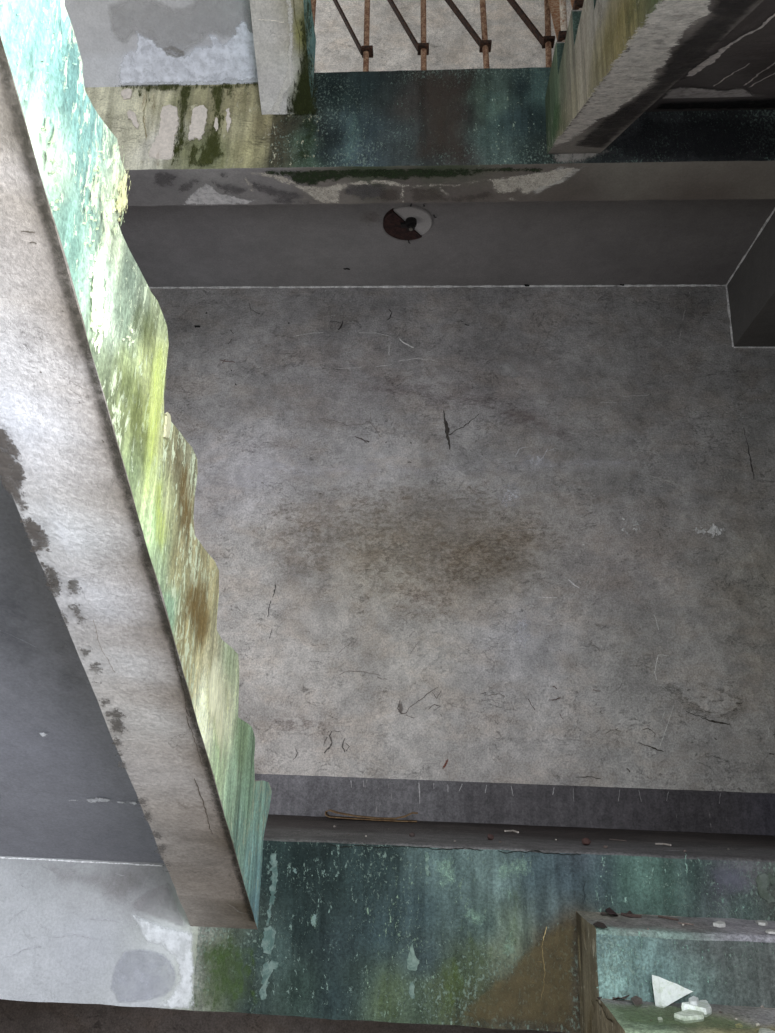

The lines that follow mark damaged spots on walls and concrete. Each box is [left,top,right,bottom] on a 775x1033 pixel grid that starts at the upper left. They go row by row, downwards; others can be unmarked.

water stain [119,22,258,84]
crack [687,14,775,87]
flaking render [149,104,231,160]
water stain [477,0,711,200]
water stain [663,87,752,99]
peeling [83,144,131,353]
water stain [0,429,84,628]
water stain [75,648,103,684]
water stain [99,699,127,769]